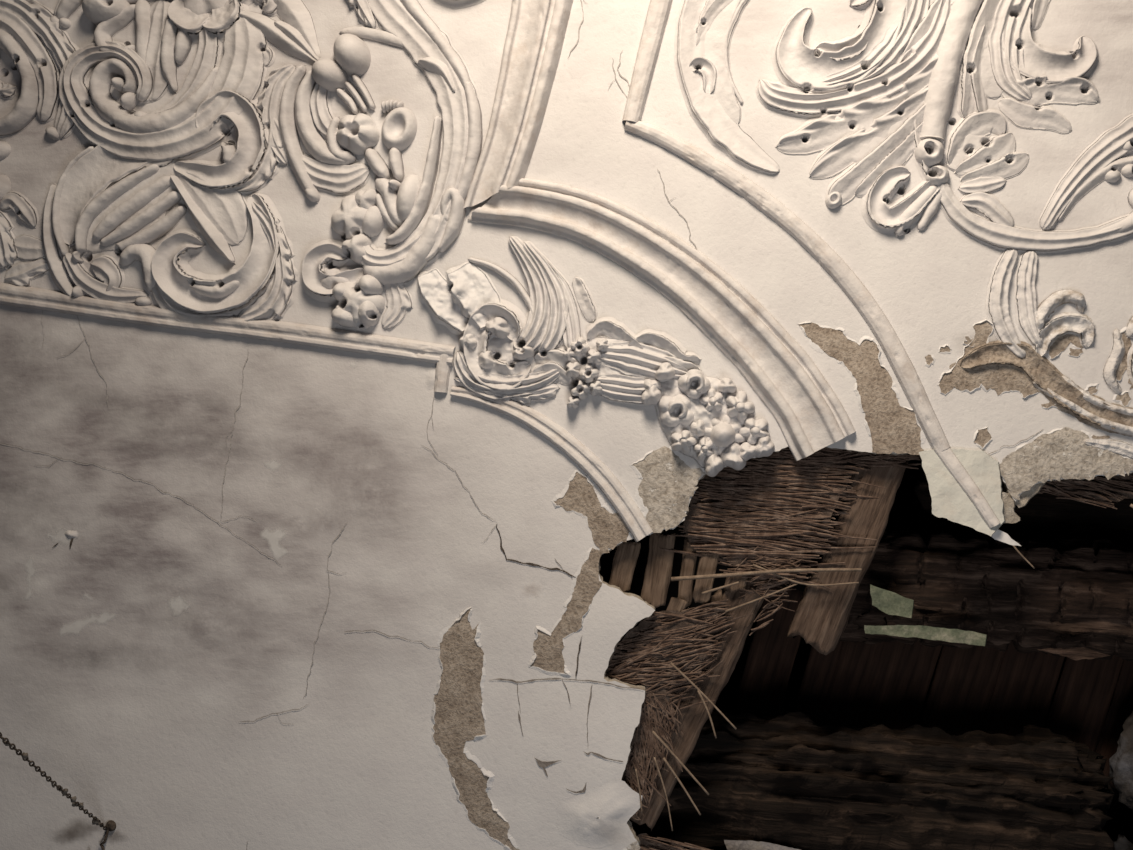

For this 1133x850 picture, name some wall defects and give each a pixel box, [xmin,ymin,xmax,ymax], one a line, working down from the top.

crack [0,351,280,565]
crack [421,399,576,578]
peeling [630,446,706,533]
peeling [797,322,926,455]
peeling [973,426,993,450]
peeling [925,319,1058,410]
peeling [999,427,1133,500]
peeling [1048,333,1087,359]
crack [245,523,347,724]
peeling [528,469,630,677]
peeling [431,606,519,850]
crack [495,637,642,793]